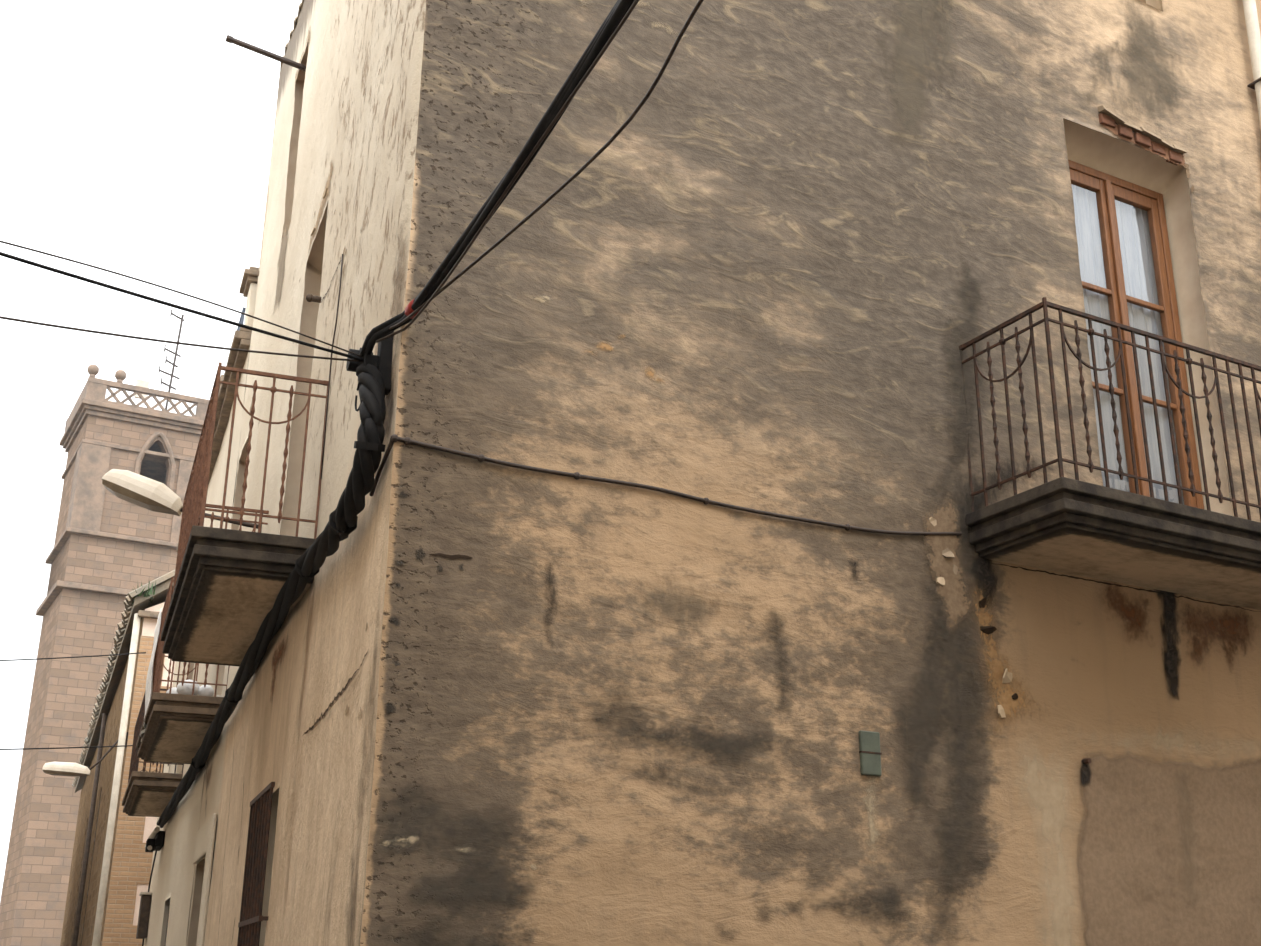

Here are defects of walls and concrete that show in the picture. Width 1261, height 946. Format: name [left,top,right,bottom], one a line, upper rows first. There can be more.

flaking render [1097,105,1194,193]
damp [948,270,982,453]
crack [303,649,369,735]
damp [596,702,672,741]
damp [695,734,768,760]
damp [900,590,979,878]
flaking render [924,499,1027,719]
damp [1156,590,1181,699]
damp [383,792,532,904]
damp [837,888,899,919]